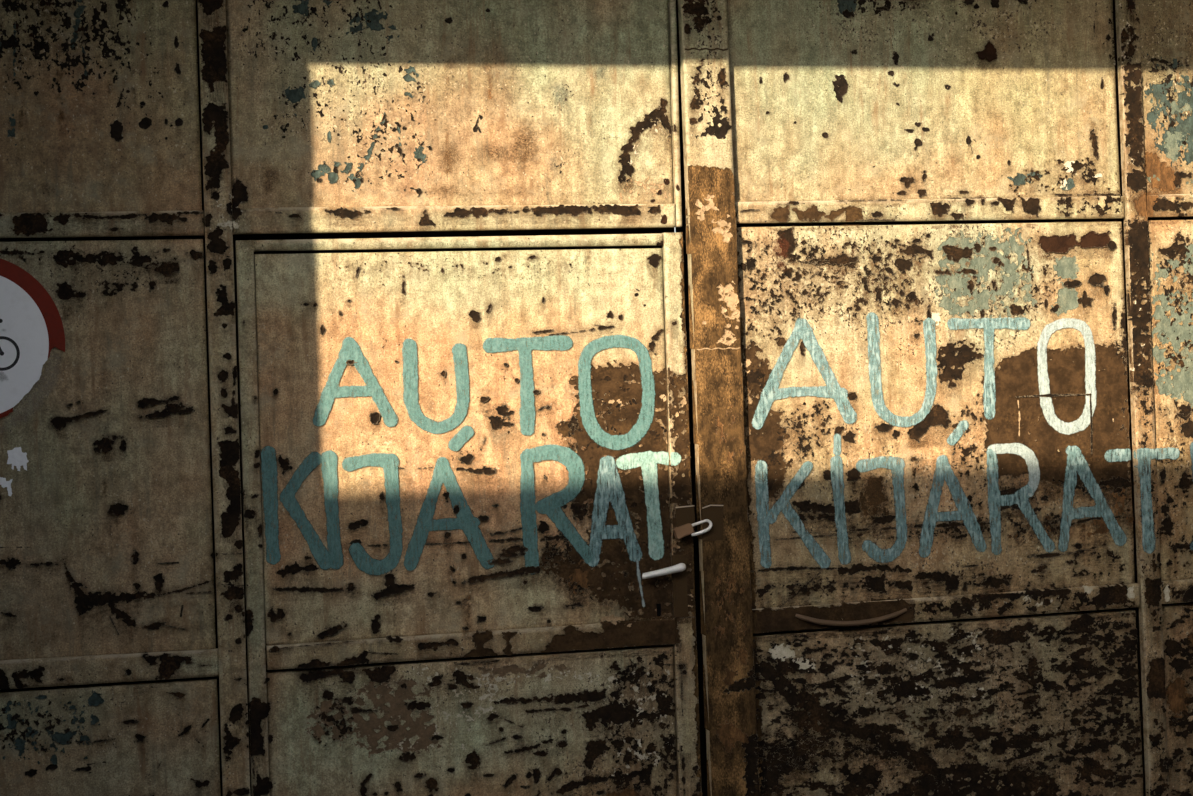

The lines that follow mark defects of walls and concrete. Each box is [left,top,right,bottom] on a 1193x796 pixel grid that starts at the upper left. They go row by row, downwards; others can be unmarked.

peeling [837,0,911,18]
peeling [0,0,183,146]
corrosion [317,198,370,223]
corrosion [419,98,680,227]
corrosion [689,58,732,139]
peeling [1144,53,1193,167]
corrosion [719,0,1193,796]
peeling [663,165,1080,796]
corrosion [416,360,701,796]
peeling [0,690,106,777]
corrosion [222,697,273,796]
peeling [305,657,608,758]